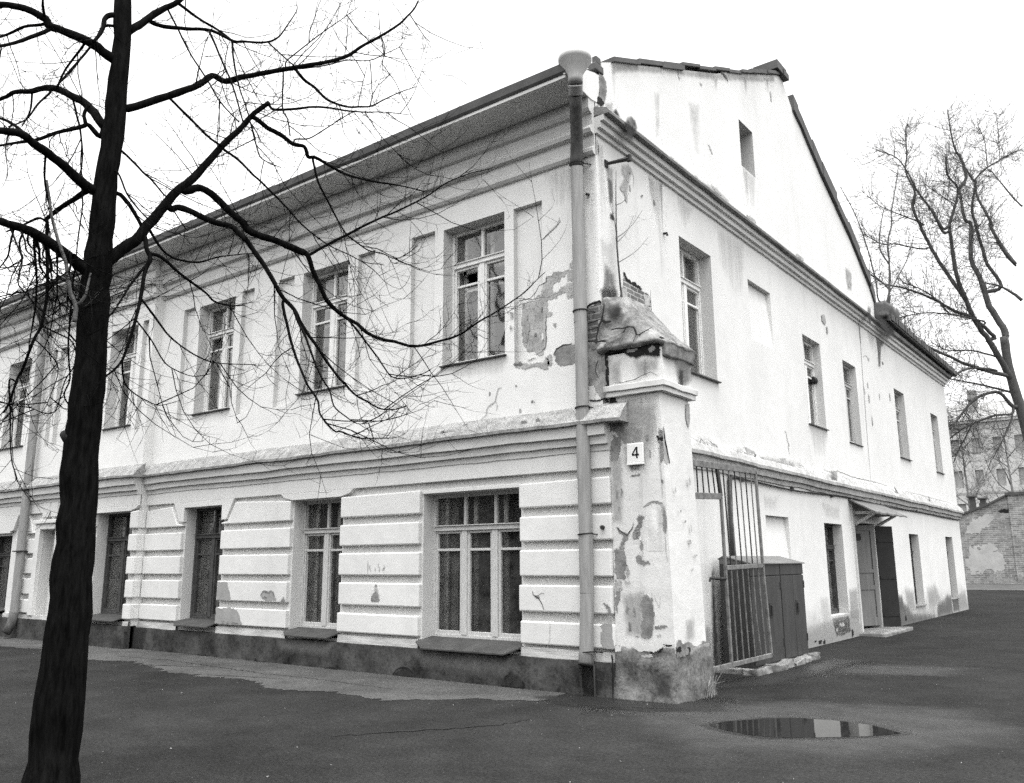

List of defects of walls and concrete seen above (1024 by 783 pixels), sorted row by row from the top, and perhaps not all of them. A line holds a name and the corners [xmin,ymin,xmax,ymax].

flaking render [510,263,575,370]
flaking render [620,272,651,308]
flaking render [587,300,707,658]